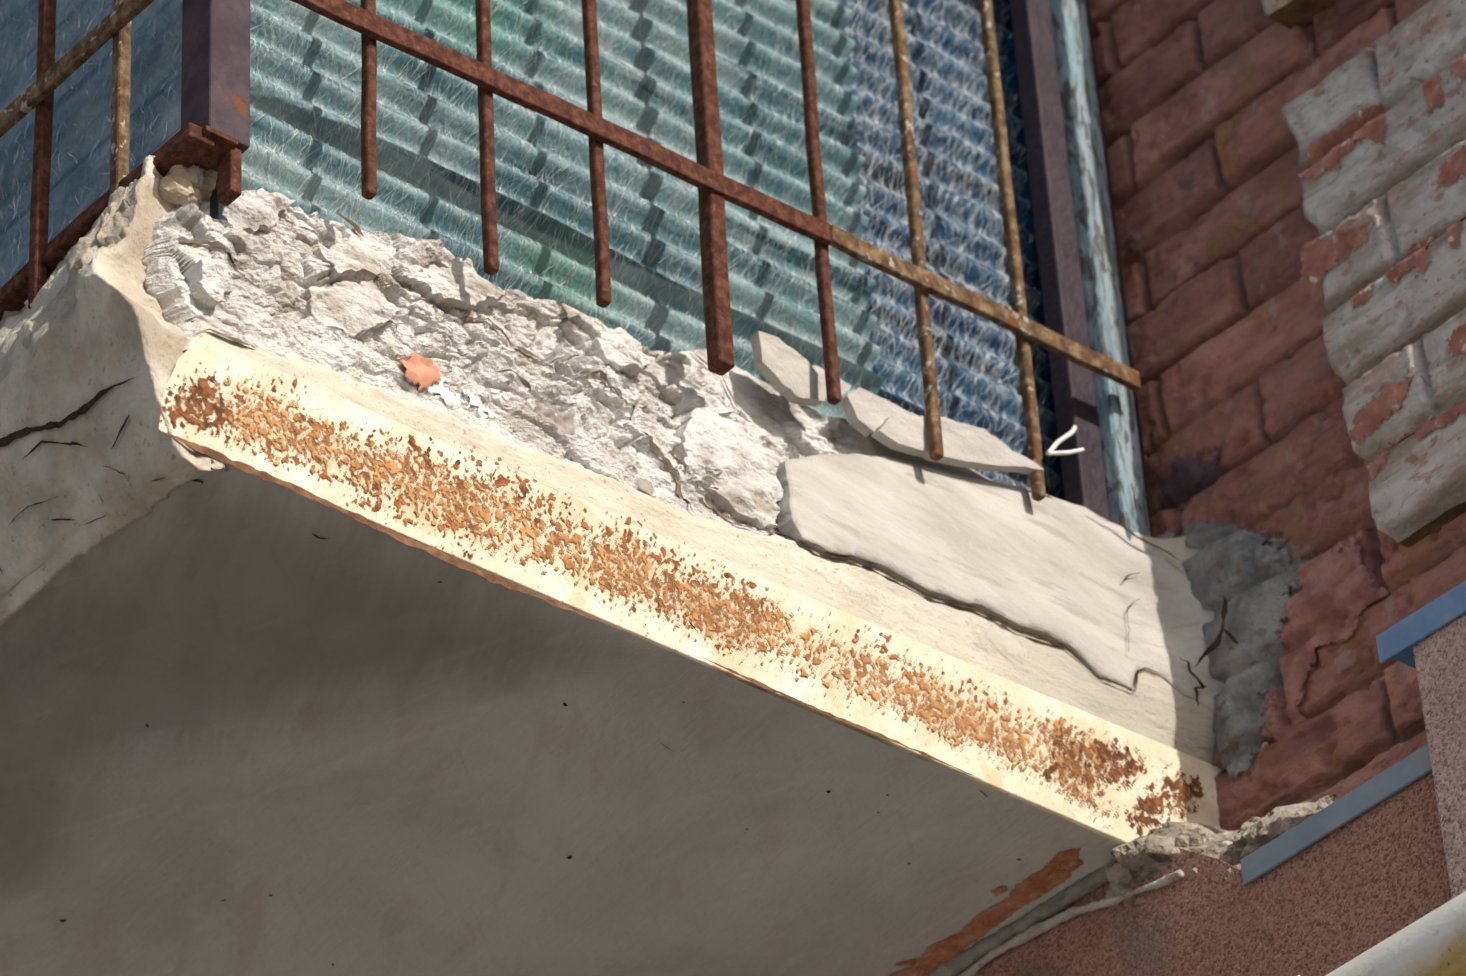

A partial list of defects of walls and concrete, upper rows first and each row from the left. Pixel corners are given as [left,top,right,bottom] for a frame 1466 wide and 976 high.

peeling [1422,54,1466,113]
peeling [1298,102,1387,180]
peeling [1436,145,1466,186]
peeling [1300,220,1376,286]
peeling [1349,217,1466,309]
peeling [1445,319,1466,356]
crack [0,378,203,526]
spalling [141,165,1225,712]
peeling [1346,376,1413,445]
crack [421,314,1239,706]
rust [160,355,1204,835]
flaking render [891,848,1084,976]